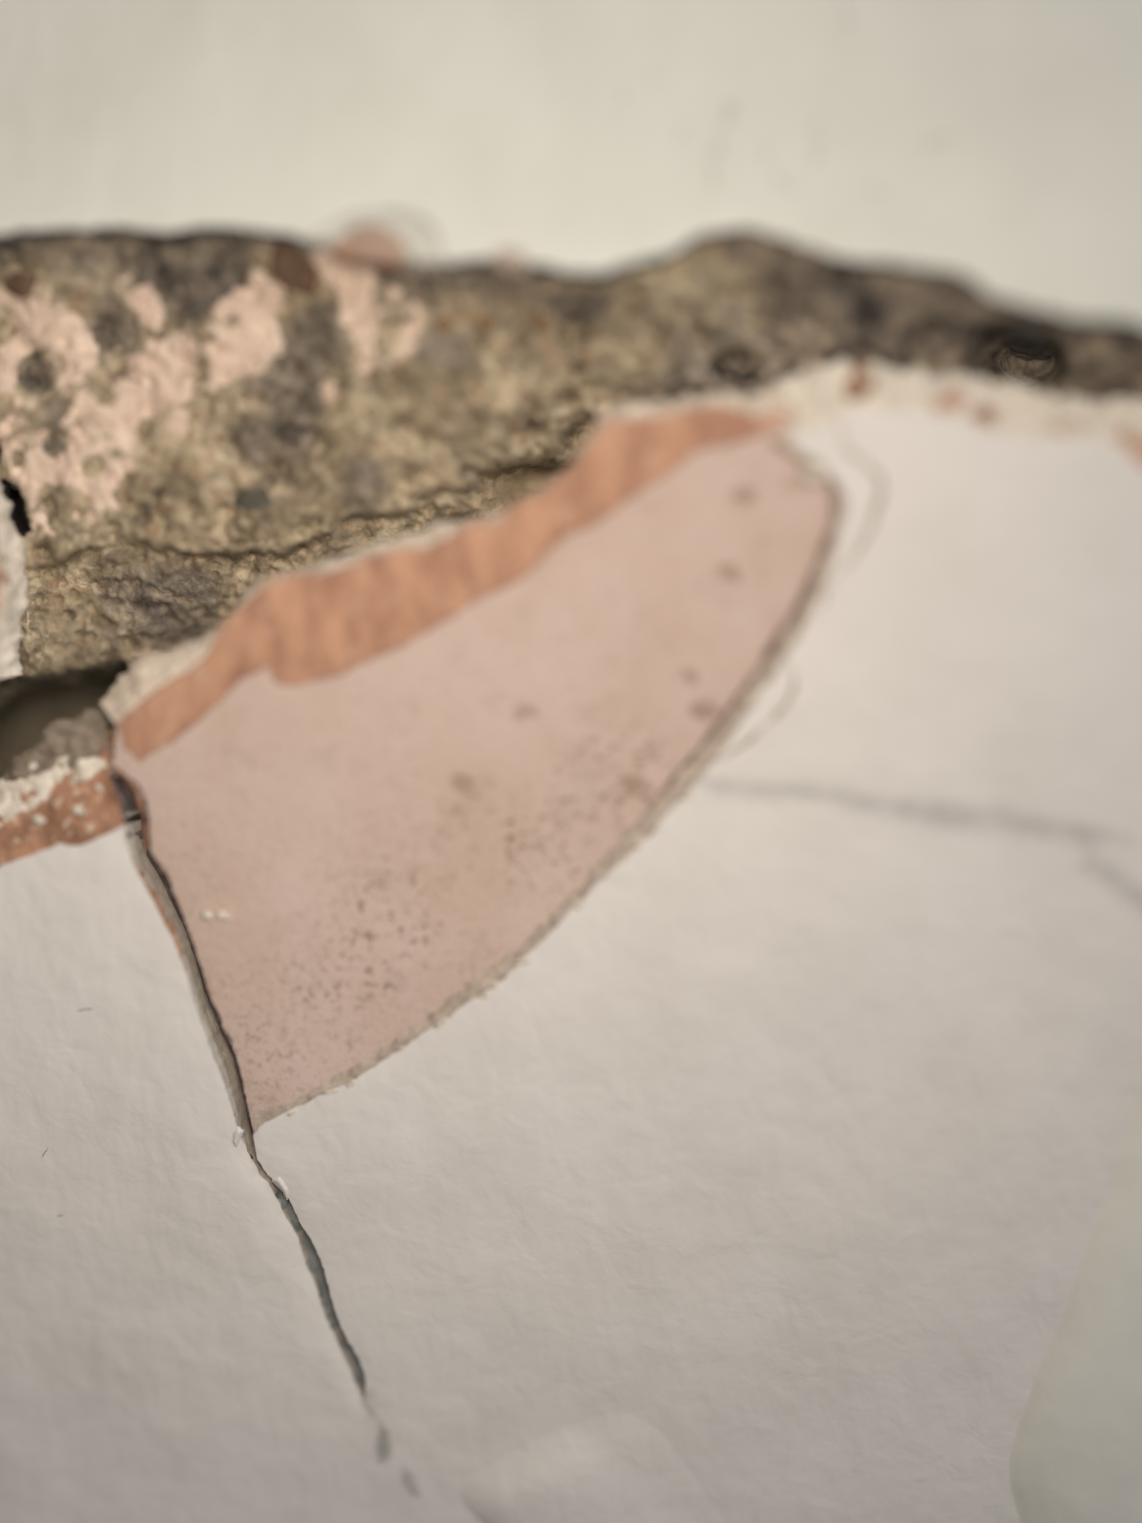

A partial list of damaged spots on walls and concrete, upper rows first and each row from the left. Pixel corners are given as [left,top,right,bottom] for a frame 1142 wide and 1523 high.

crack [0,659,366,1389]
peeling [0,210,1142,1135]